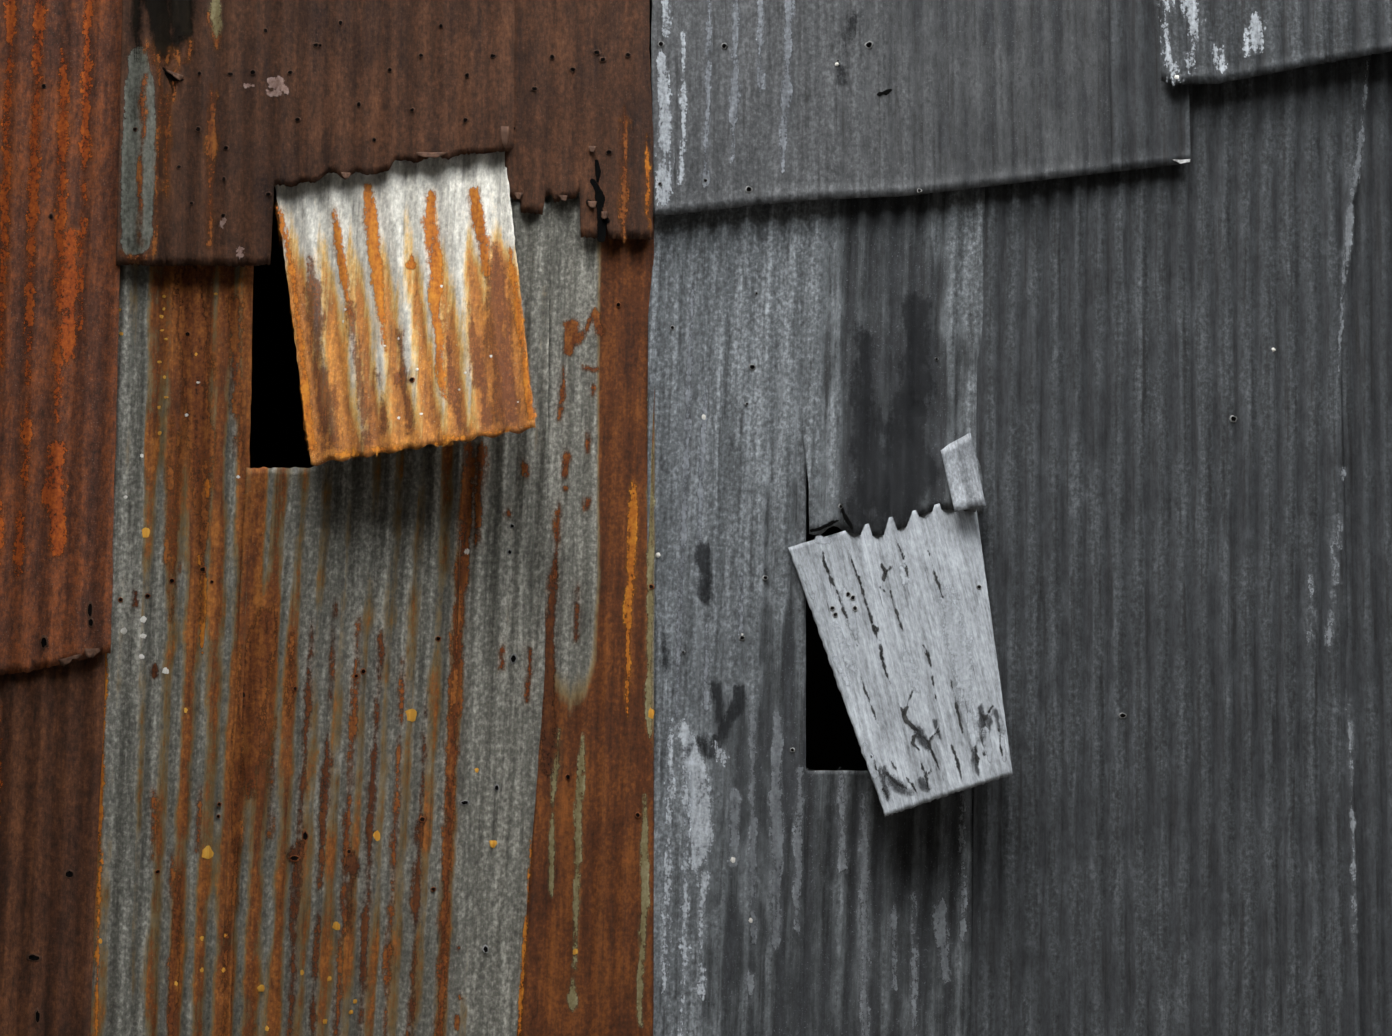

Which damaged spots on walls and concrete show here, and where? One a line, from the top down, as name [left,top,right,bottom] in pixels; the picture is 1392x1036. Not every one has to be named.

rust [0,0,94,576]
rust [143,40,193,66]
rust [203,85,220,249]
rust [557,307,605,421]
rust [617,106,651,241]
rust [220,182,537,1036]
rust [524,432,591,776]
rust [623,481,639,718]
rust [94,653,109,1036]
rust [150,789,183,1036]